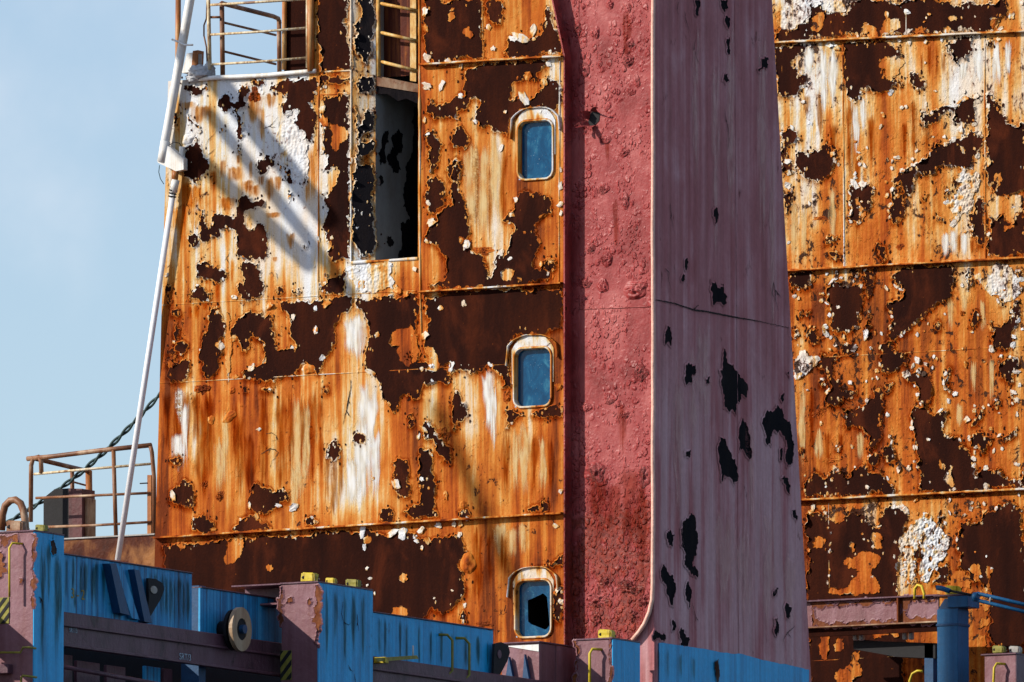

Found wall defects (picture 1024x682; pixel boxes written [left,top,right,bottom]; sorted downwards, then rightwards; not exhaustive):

water stain [345,316,362,357]
peeling [161,0,567,648]
crack [656,264,788,328]
peeling [757,0,1024,682]
corrosion [164,396,211,488]
corrosion [277,398,343,511]
water stain [347,384,380,500]
peeling [683,347,753,487]
peeling [651,512,699,647]